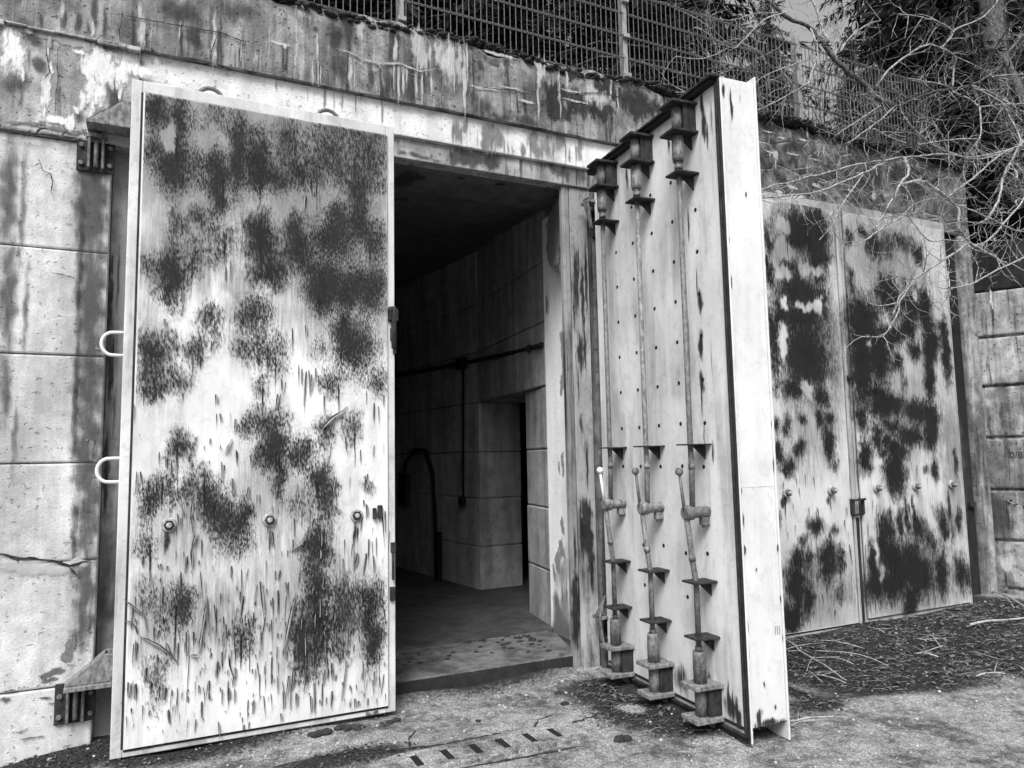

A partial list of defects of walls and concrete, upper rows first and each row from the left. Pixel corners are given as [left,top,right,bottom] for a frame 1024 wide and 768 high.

water stain [312,16,365,110]
water stain [370,28,660,180]
water stain [2,160,24,235]
water stain [0,253,27,327]
water stain [71,171,107,648]
crack [0,553,91,575]